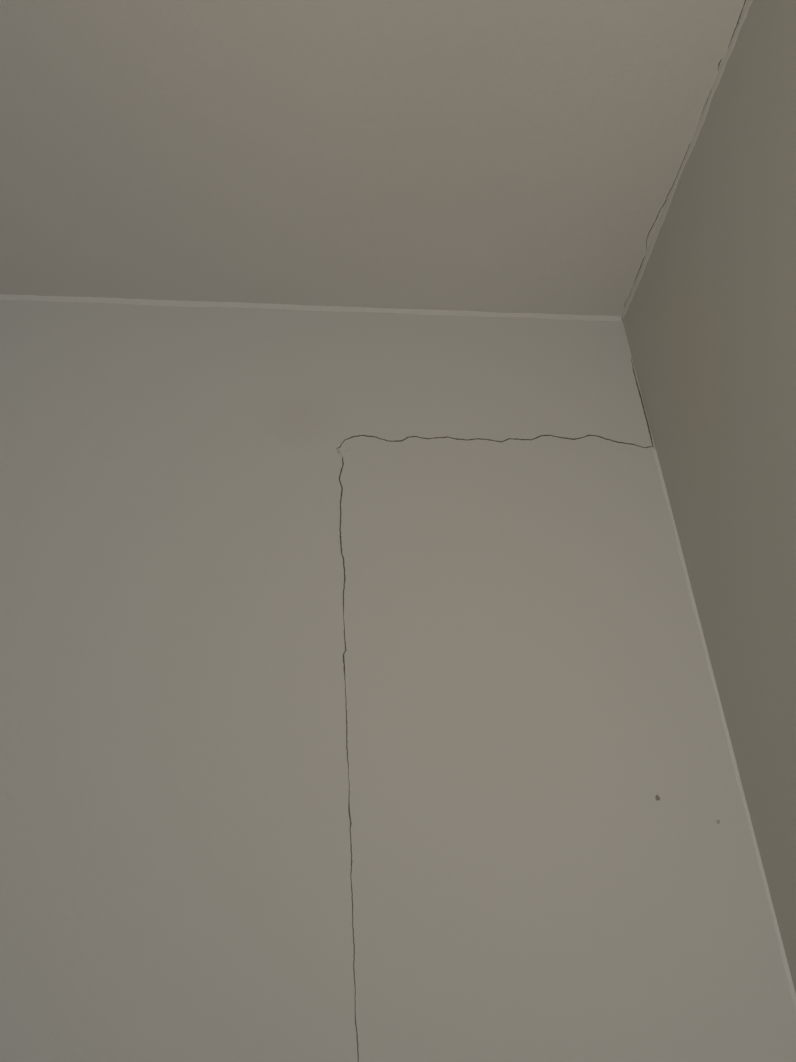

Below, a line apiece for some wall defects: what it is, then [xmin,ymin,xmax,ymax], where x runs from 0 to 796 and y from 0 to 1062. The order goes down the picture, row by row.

crack [336,358,654,1062]